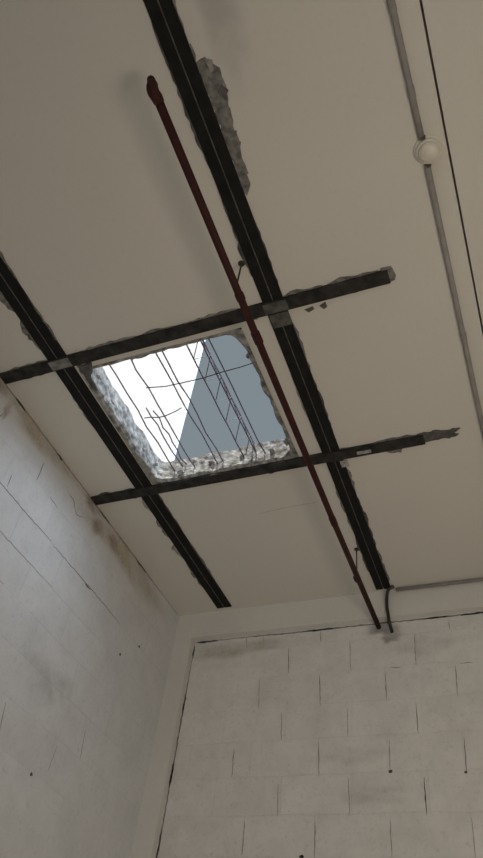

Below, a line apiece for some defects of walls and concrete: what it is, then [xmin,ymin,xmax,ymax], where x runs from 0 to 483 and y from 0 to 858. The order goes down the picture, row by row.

spalling [196,57,251,195]
spalling [77,328,298,485]